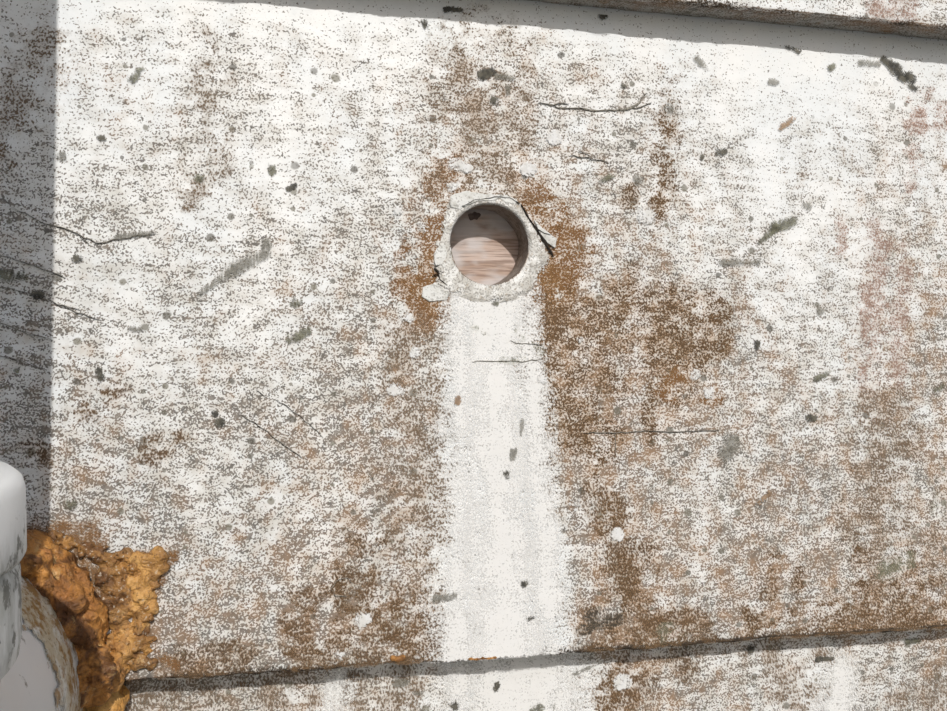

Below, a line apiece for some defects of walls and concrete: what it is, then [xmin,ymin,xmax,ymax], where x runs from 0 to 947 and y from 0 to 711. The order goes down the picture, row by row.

crack [468,196,554,257]
damp [421,279,596,711]
damp [878,551,914,581]
damp [576,609,623,635]